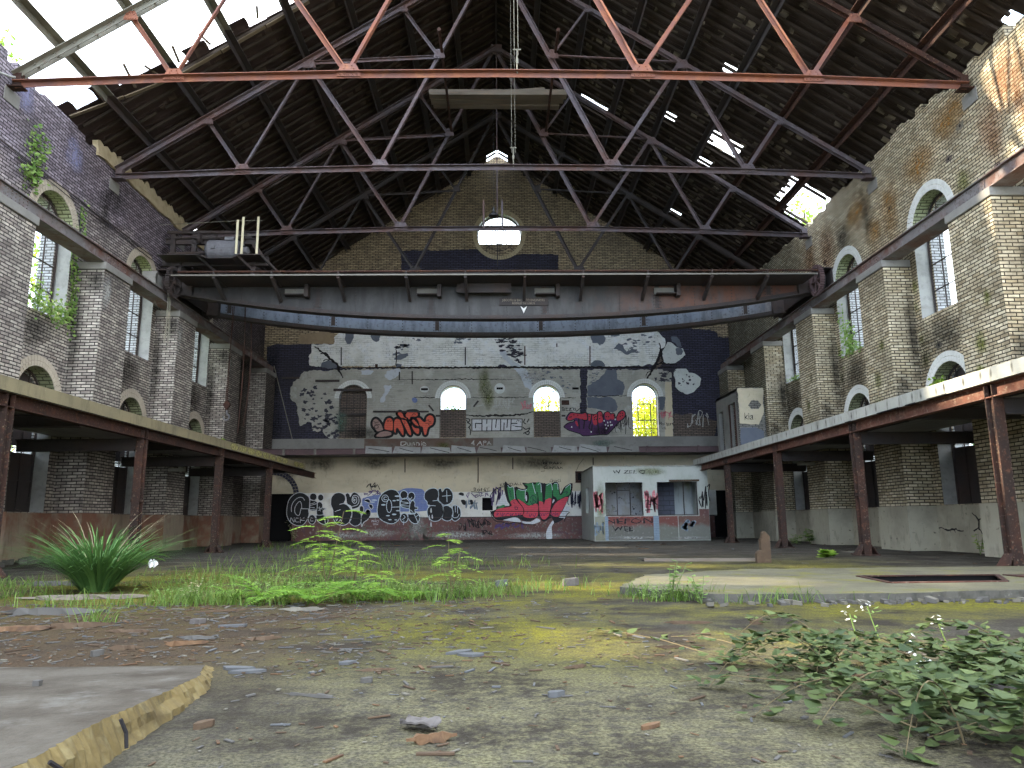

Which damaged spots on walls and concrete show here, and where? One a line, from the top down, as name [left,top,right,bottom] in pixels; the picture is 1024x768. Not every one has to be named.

peeling [321,360,337,369]
peeling [393,337,426,367]
crack [315,343,685,417]
peeling [494,338,571,394]
peeling [591,334,655,355]
peeling [654,357,694,386]
crack [939,513,982,533]